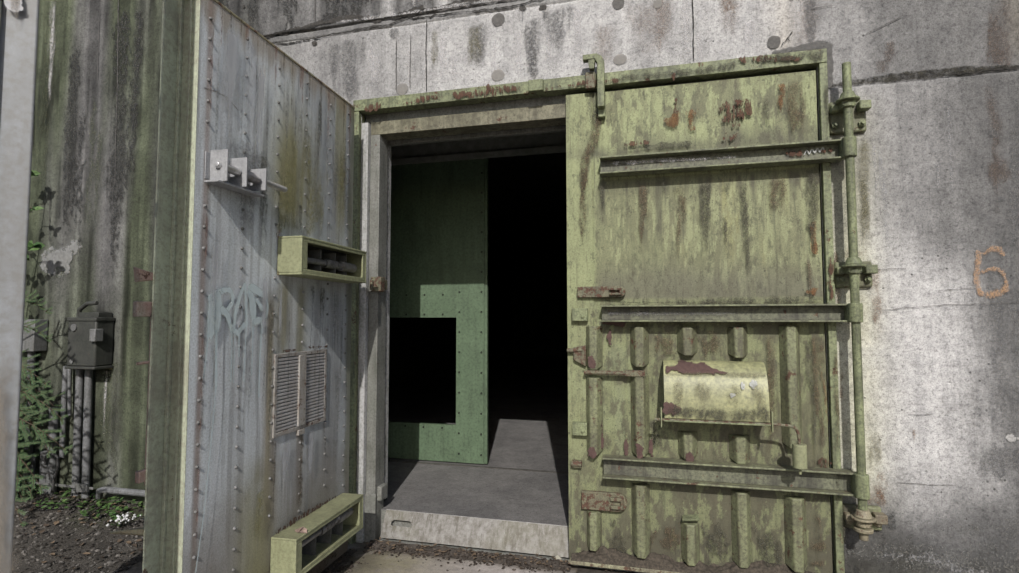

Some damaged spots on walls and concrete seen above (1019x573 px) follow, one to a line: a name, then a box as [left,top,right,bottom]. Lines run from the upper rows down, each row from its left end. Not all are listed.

water stain [515,7,581,78]
water stain [63,51,86,224]
water stain [105,10,143,259]
corrosion [453,84,520,99]
corrosion [719,99,753,142]
peeling [40,240,82,277]